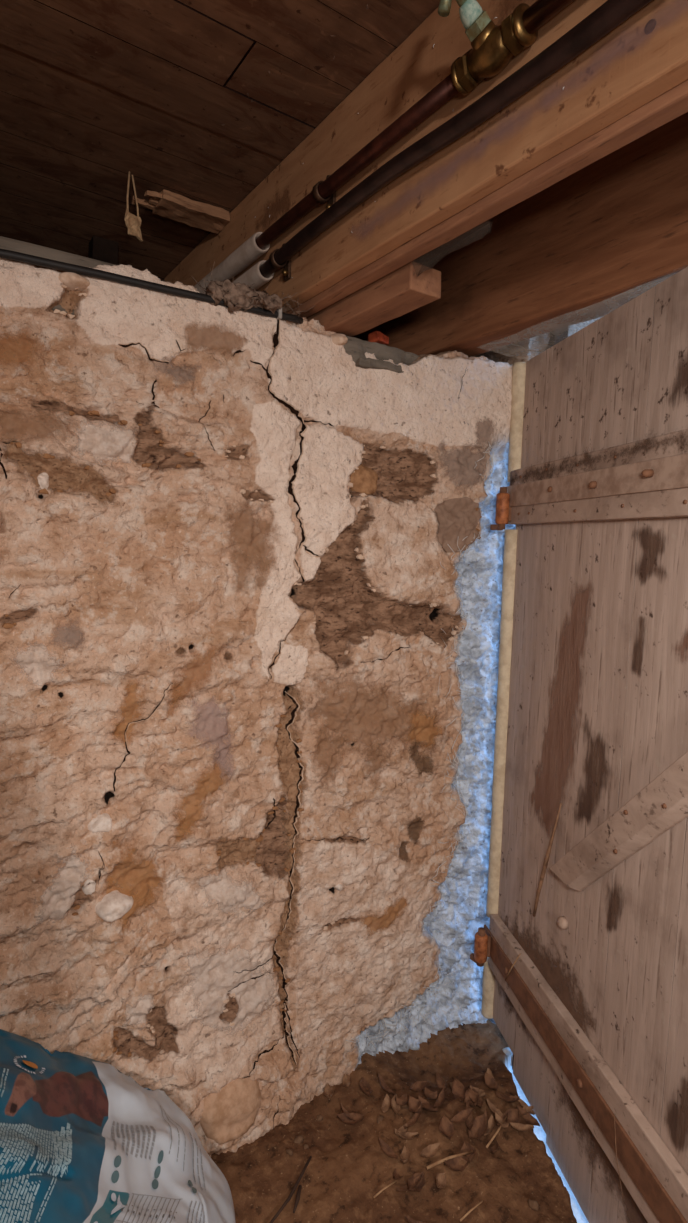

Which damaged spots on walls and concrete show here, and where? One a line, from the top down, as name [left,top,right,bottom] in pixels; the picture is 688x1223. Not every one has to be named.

water stain [669,360,688,401]
spalling [33,400,205,470]
crack [233,319,333,583]
water stain [439,419,494,487]
spalling [288,444,462,669]
crack [113,683,173,791]
water stain [309,673,443,785]
crack [228,623,364,1079]
water stain [399,817,424,862]
water stain [364,898,407,932]